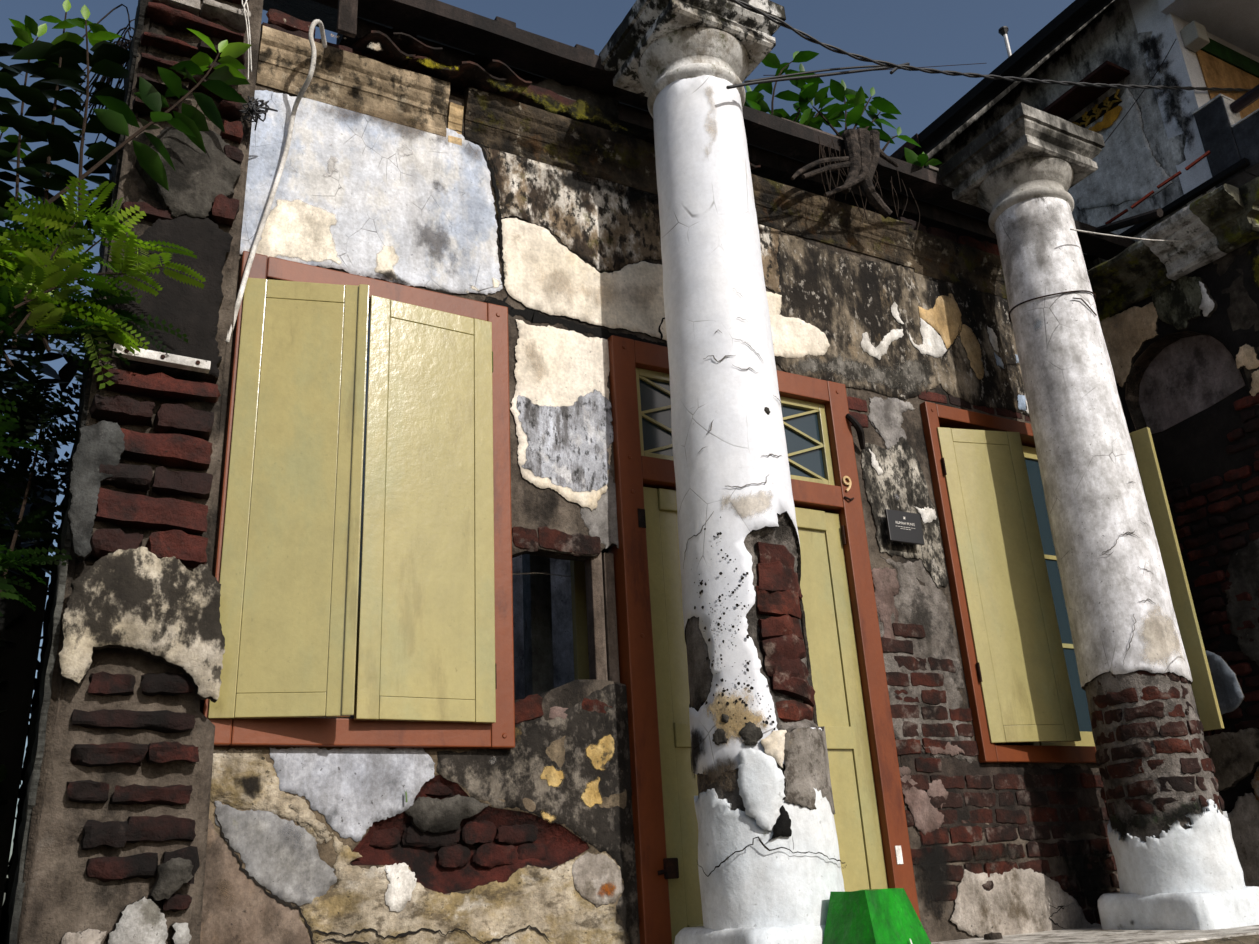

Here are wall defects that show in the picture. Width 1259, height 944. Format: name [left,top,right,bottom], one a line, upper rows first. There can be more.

leakage [1139,34,1194,144]
leakage [524,163,659,206]
crack [704,292,783,407]
peeling [860,294,1019,380]
crack [683,454,782,566]
spalling [686,617,713,711]
spalling [712,542,835,831]
flaking render [881,344,1259,925]
crack [214,812,549,944]
spalling [214,747,589,912]
crack [697,836,847,877]